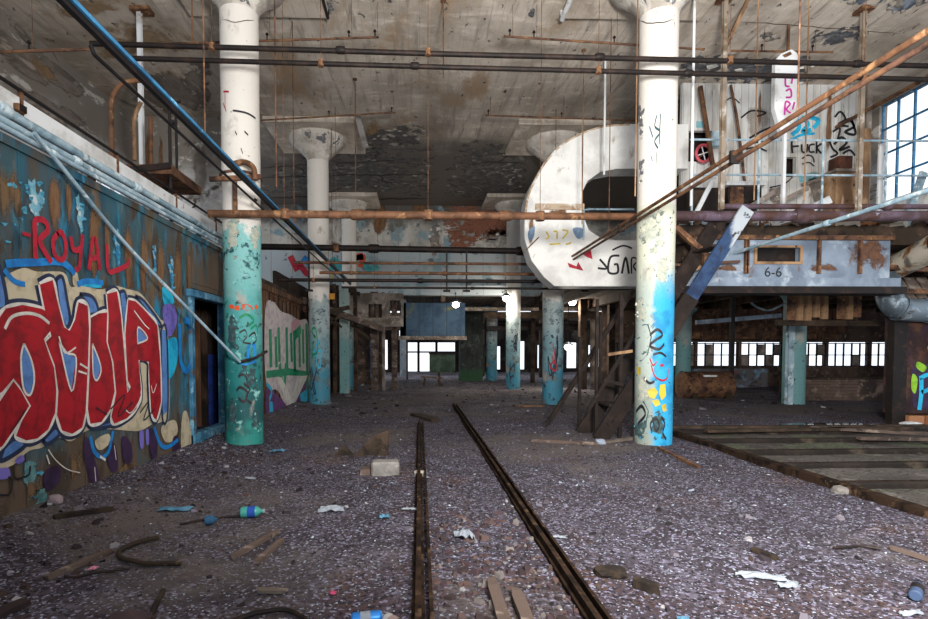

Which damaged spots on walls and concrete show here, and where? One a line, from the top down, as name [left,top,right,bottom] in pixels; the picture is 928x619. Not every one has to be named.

peeling [844,0,928,14]
peeling [428,140,526,256]
peeling [227,218,259,259]
corrosion [854,241,886,270]
peeling [228,314,239,352]